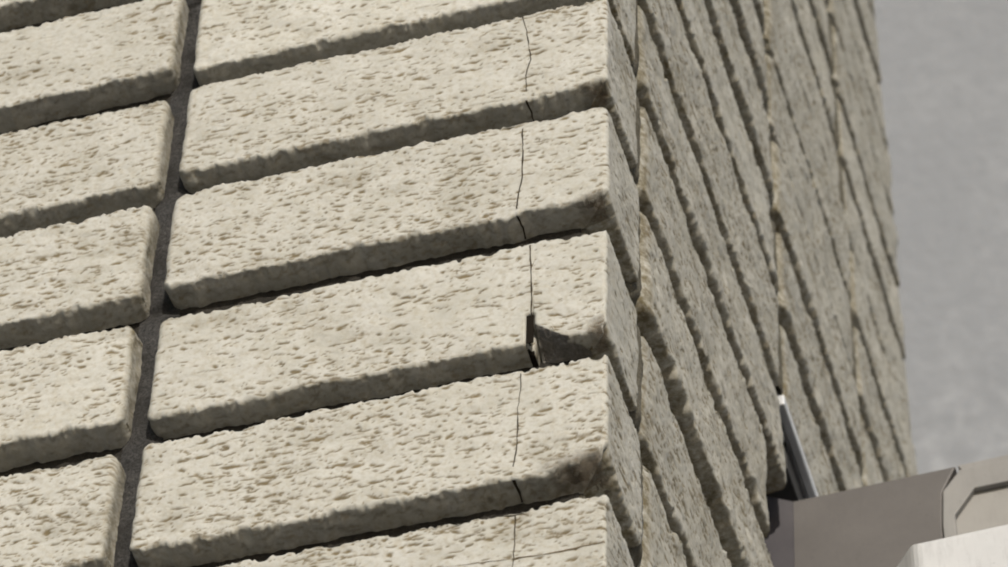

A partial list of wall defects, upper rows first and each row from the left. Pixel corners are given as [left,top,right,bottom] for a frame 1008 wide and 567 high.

crack [516,17,534,315]
spalling [526,315,593,367]
crack [445,373,617,567]